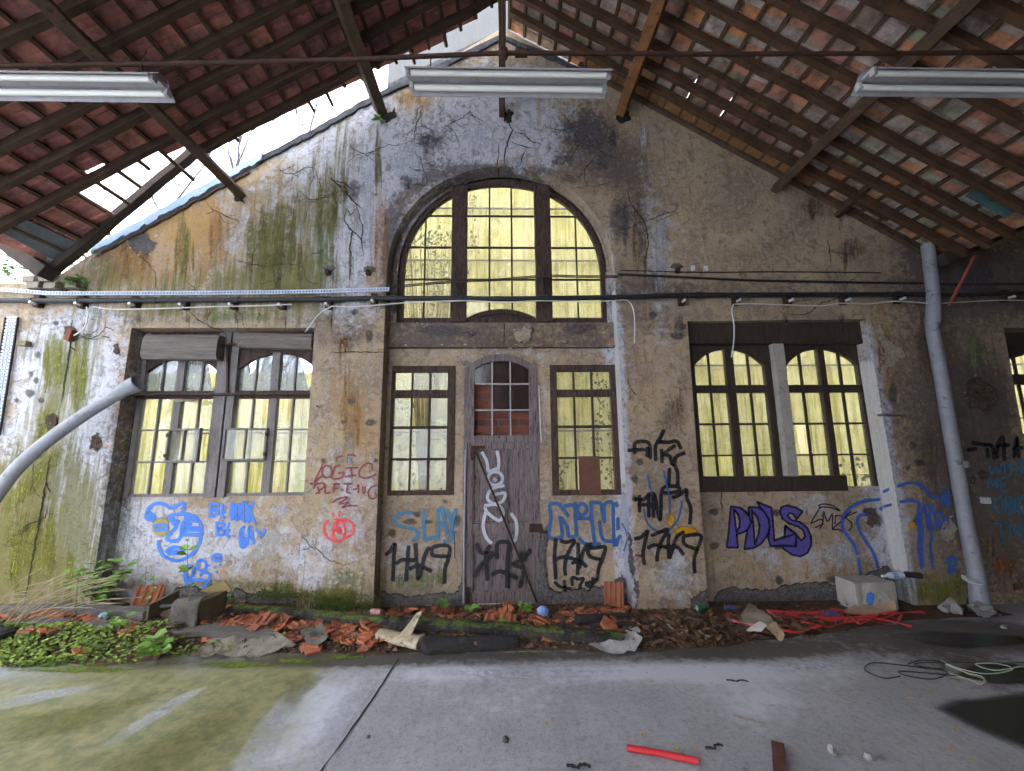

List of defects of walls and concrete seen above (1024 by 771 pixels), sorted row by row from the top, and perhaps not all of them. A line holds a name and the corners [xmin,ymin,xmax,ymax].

spalling [126,233,162,257]
water stain [246,209,303,276]
water stain [318,187,334,278]
water stain [340,141,387,263]
crack [176,102,678,354]
water stain [43,338,86,407]
crack [4,450,51,596]
crack [300,538,353,566]